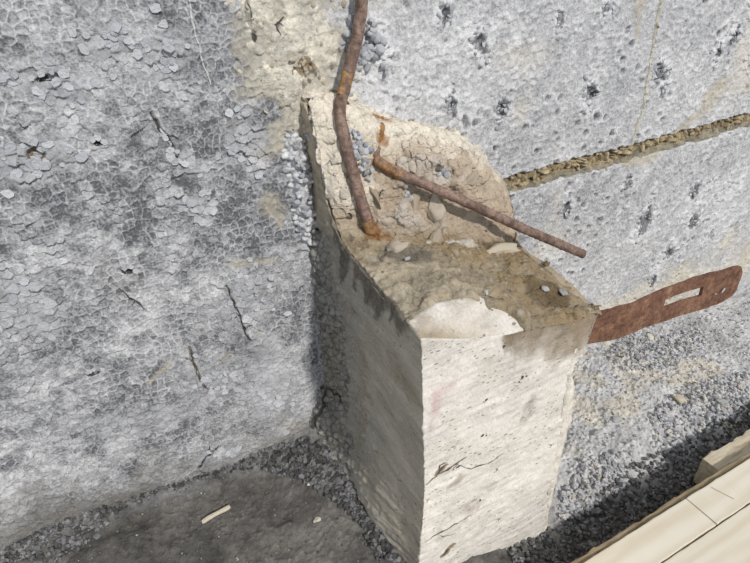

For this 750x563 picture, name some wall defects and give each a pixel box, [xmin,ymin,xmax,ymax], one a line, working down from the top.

crack [150,113,179,158]
spalling [289,0,602,331]
crack [119,288,146,310]
crack [225,285,252,340]
peeling [231,277,275,323]
crack [186,346,216,390]
crack [311,386,343,429]
crack [429,457,498,483]